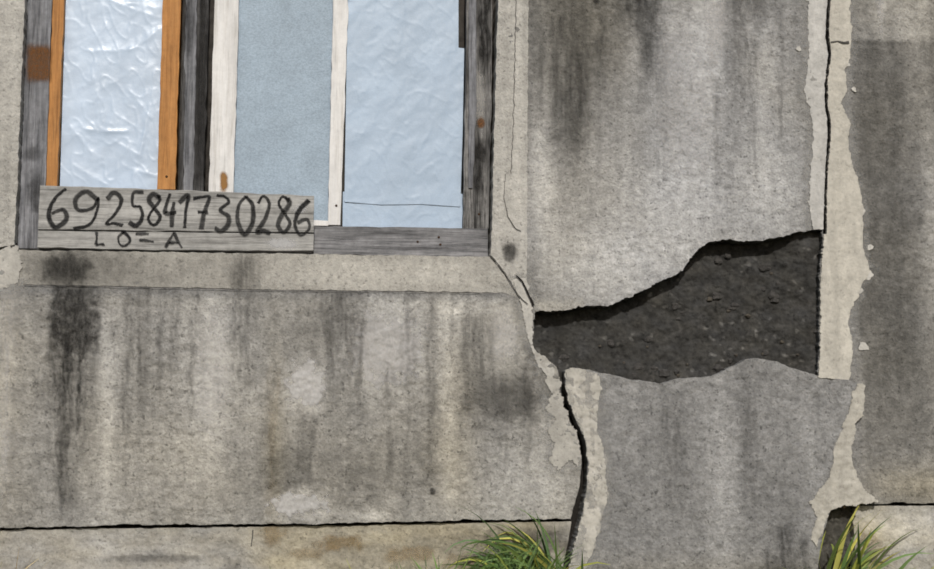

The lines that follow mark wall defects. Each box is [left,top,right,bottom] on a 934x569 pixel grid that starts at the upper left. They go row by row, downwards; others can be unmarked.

crack [824,0,849,97]
damp [49,255,100,400]
spalling [532,231,820,404]
crack [559,404,584,568]